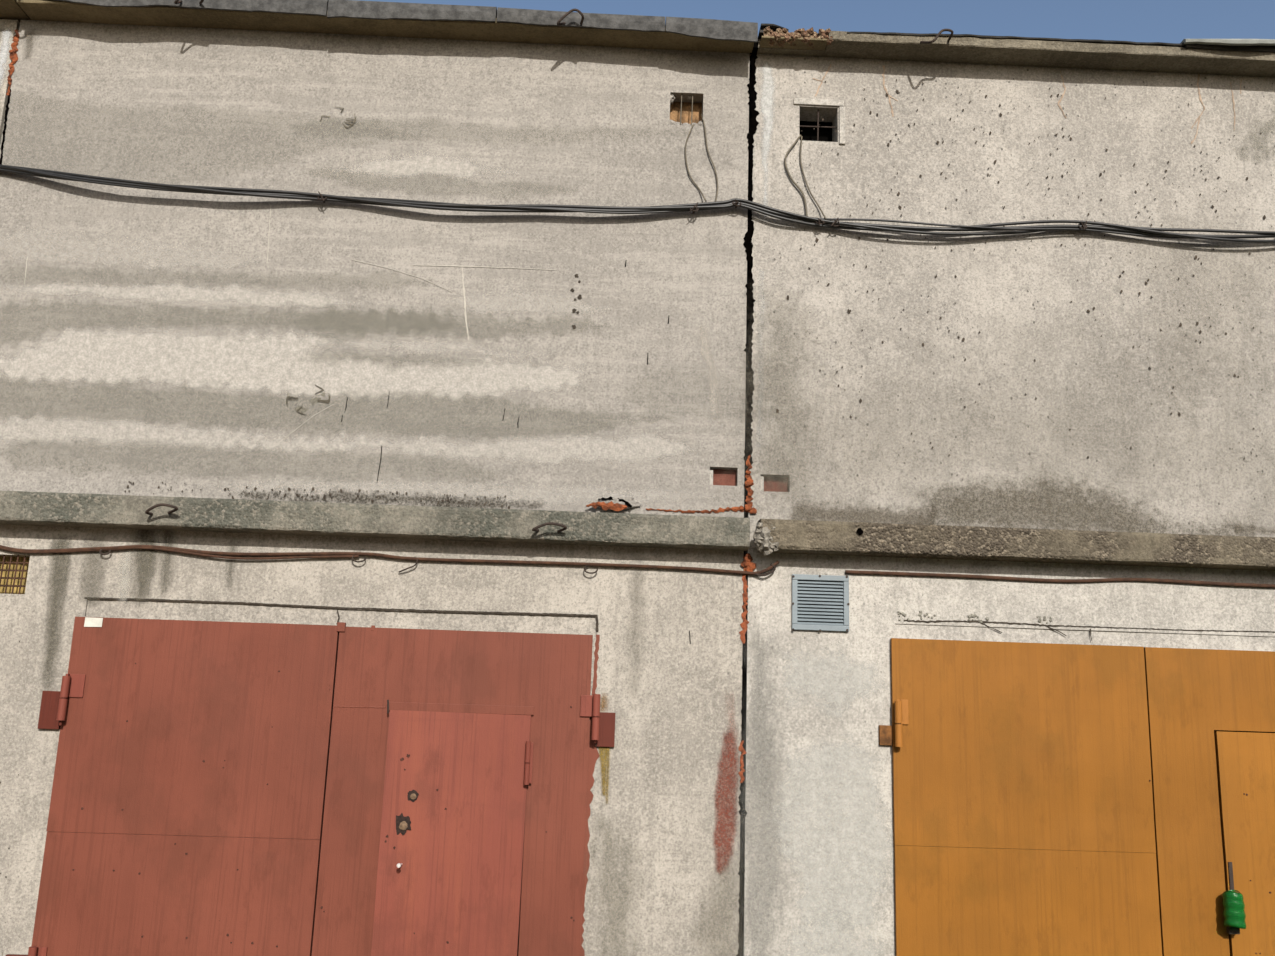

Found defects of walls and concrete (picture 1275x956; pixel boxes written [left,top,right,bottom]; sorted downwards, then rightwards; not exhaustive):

spalling [763,26,833,49]
crack [743,53,760,465]
damp [794,480,1166,533]
damp [122,529,171,597]
corrosion [739,574,749,644]
corrosion [738,740,747,783]
crack [736,653,747,956]